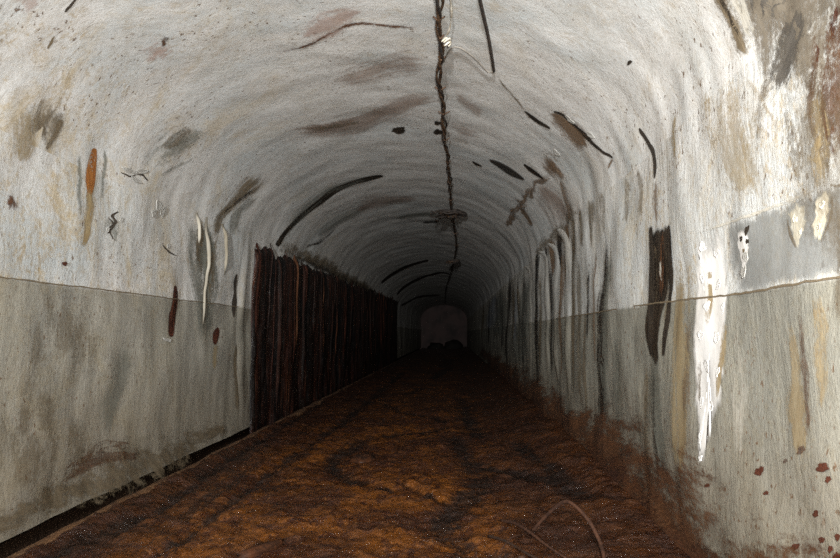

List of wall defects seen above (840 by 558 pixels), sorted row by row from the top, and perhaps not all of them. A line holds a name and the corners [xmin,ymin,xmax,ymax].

water stain [714,0,840,182]
rust [78,148,107,245]
rust [250,242,398,434]
water stain [481,182,611,424]
rust [479,348,825,558]
water stain [644,226,689,494]
peeling [693,184,840,461]
rust [816,462,831,483]